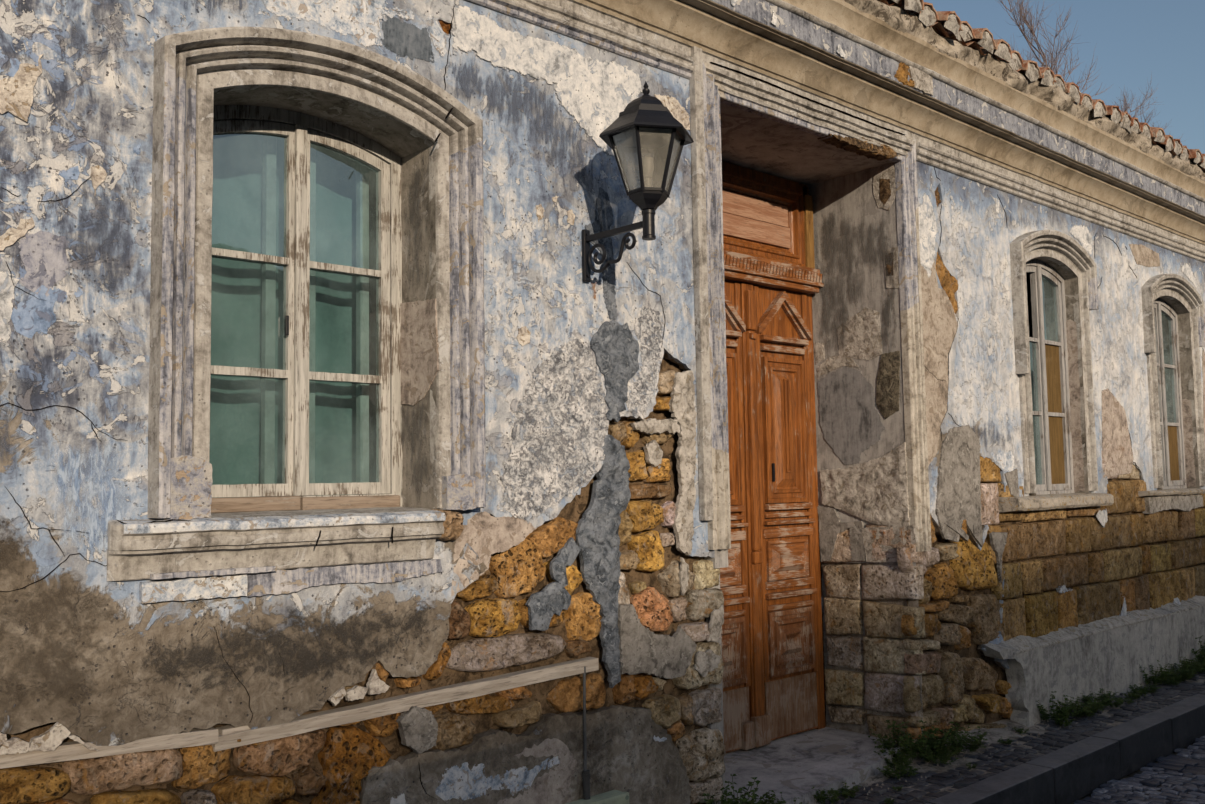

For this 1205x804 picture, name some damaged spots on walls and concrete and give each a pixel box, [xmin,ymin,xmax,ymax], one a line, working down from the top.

peeling [258,0,690,156]
crack [1,178,89,202]
peeling [0,217,83,348]
peeling [918,187,958,466]
crack [0,403,127,441]
spalling [876,351,900,419]
water stain [0,586,110,700]
crack [0,488,190,592]
water stain [144,607,426,690]
spalling [302,305,726,804]
spalling [821,450,1205,750]
spalling [0,712,413,804]